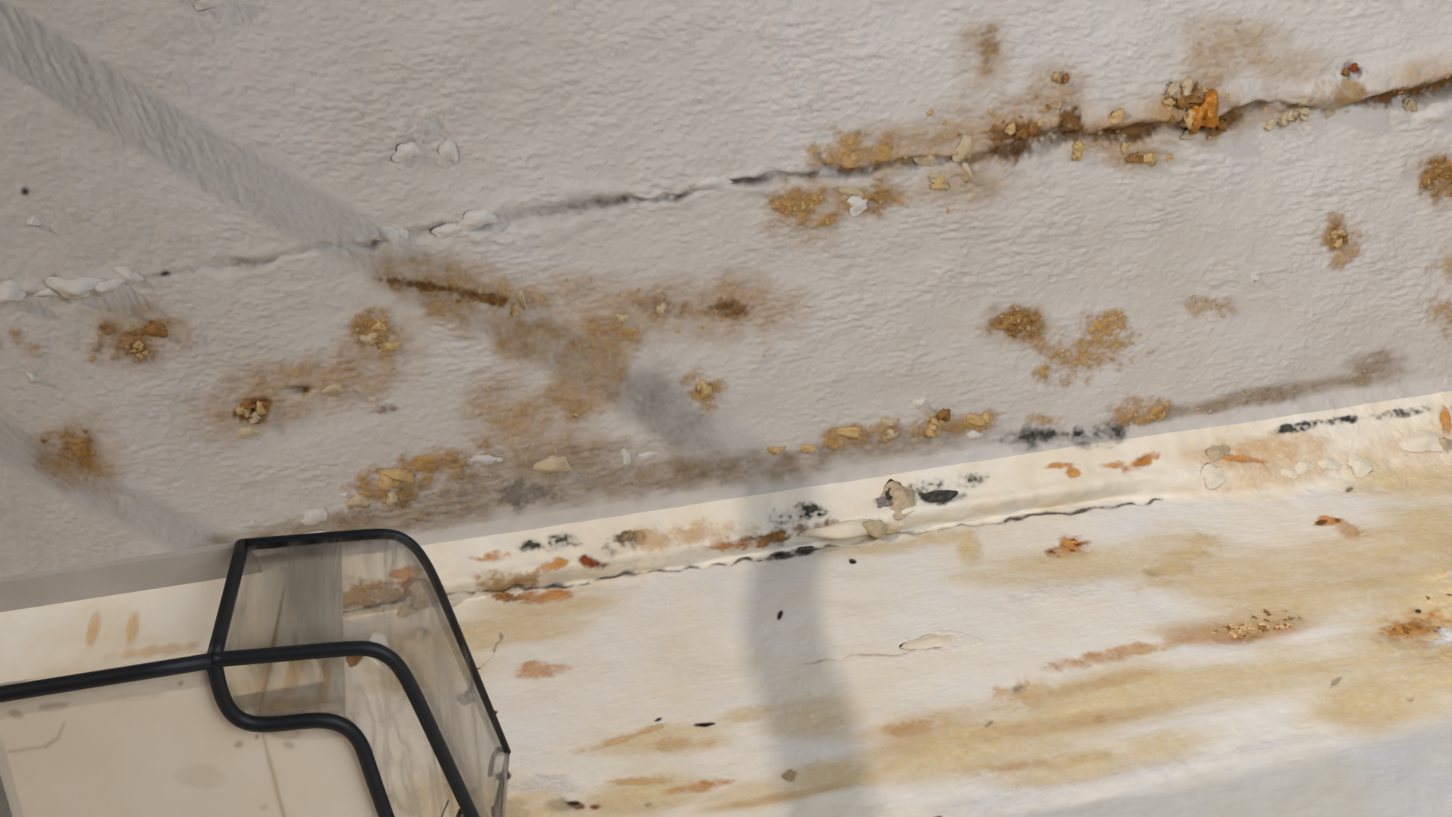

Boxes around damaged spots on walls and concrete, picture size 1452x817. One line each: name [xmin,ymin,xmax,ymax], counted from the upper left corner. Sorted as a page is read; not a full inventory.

crack [806,76,1313,216]
crack [675,175,764,200]
crack [0,267,144,305]
spalling [235,384,272,439]
peeling [767,397,994,455]
crack [999,498,1160,524]
water stain [1278,409,1452,574]
crack [485,545,832,591]
water stain [396,600,589,655]
water stain [876,663,1310,781]
water stain [428,789,565,817]
water stain [611,778,728,804]